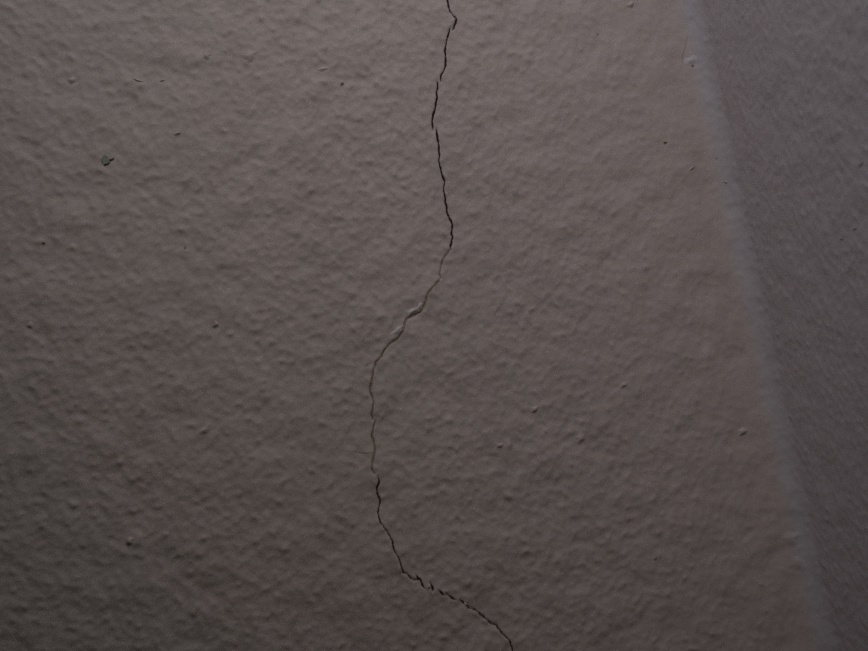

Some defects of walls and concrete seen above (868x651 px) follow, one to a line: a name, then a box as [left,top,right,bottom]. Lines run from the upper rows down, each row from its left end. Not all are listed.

crack [355,0,513,651]